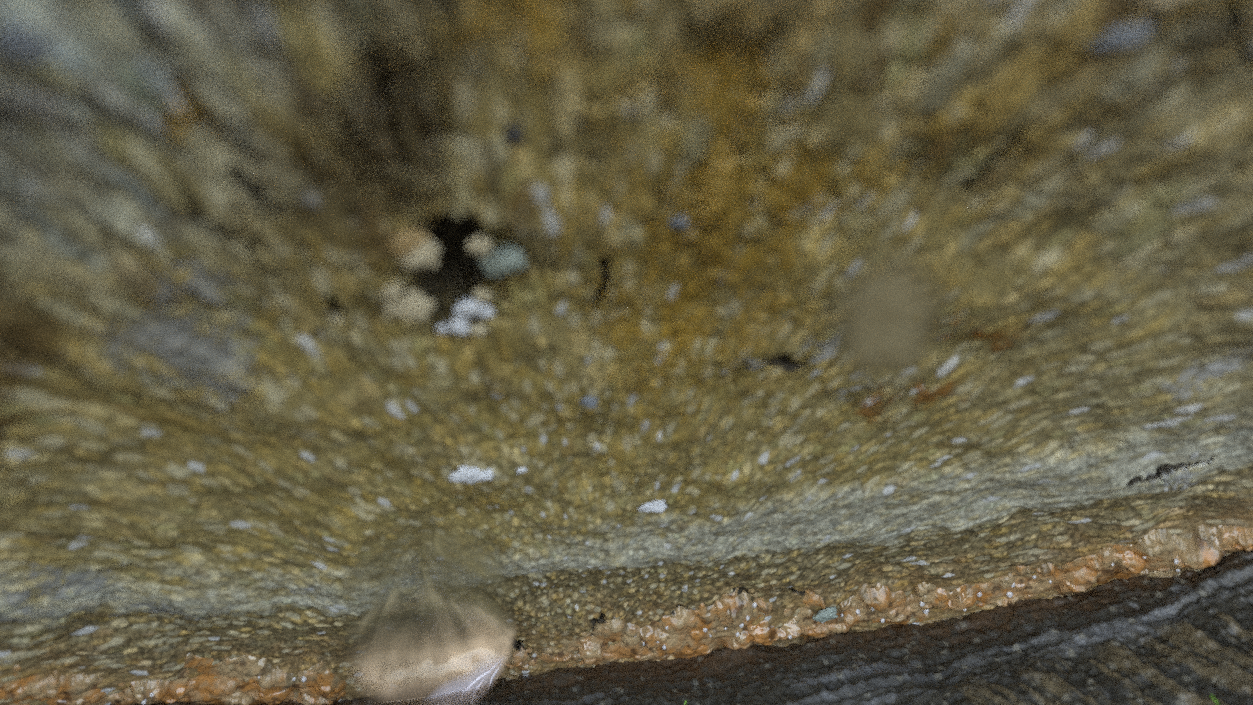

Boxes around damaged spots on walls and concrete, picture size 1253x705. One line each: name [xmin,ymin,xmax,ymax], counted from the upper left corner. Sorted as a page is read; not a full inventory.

spalling [380,215,527,338]
rust [504,524,1253,671]
rust [0,653,347,705]